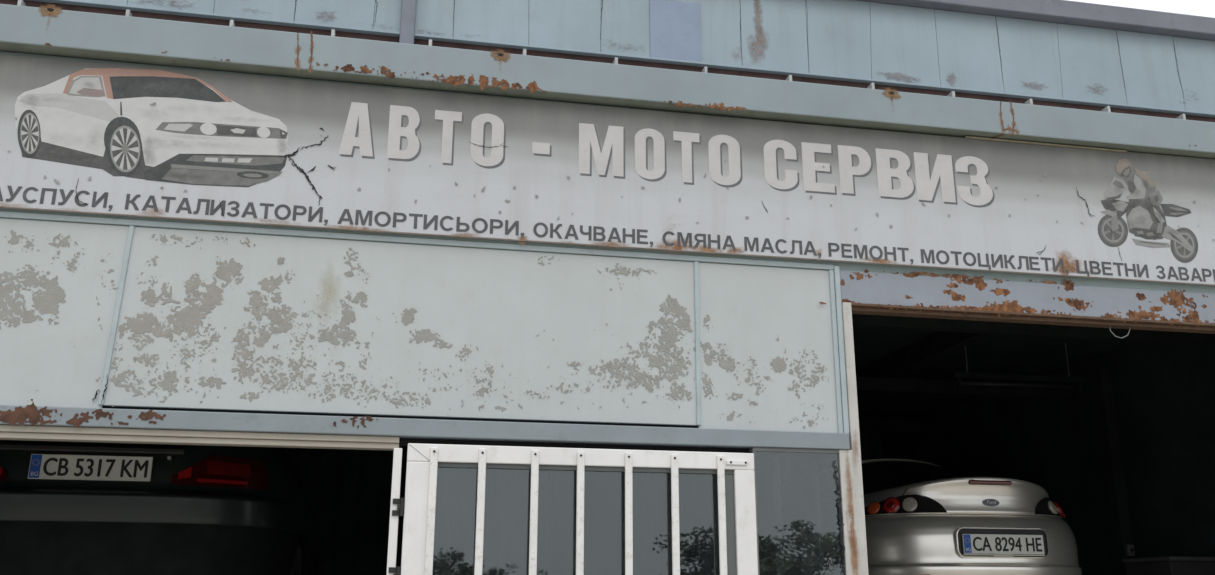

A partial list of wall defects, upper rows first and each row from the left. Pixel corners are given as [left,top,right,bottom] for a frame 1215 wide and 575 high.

rust [296,31,546,94]
rust [991,100,1019,139]
crack [284,128,334,206]
peeling [0,230,85,329]
rust [840,255,1215,327]
peeling [96,232,829,429]
rust [0,399,166,428]
rust [333,416,378,428]